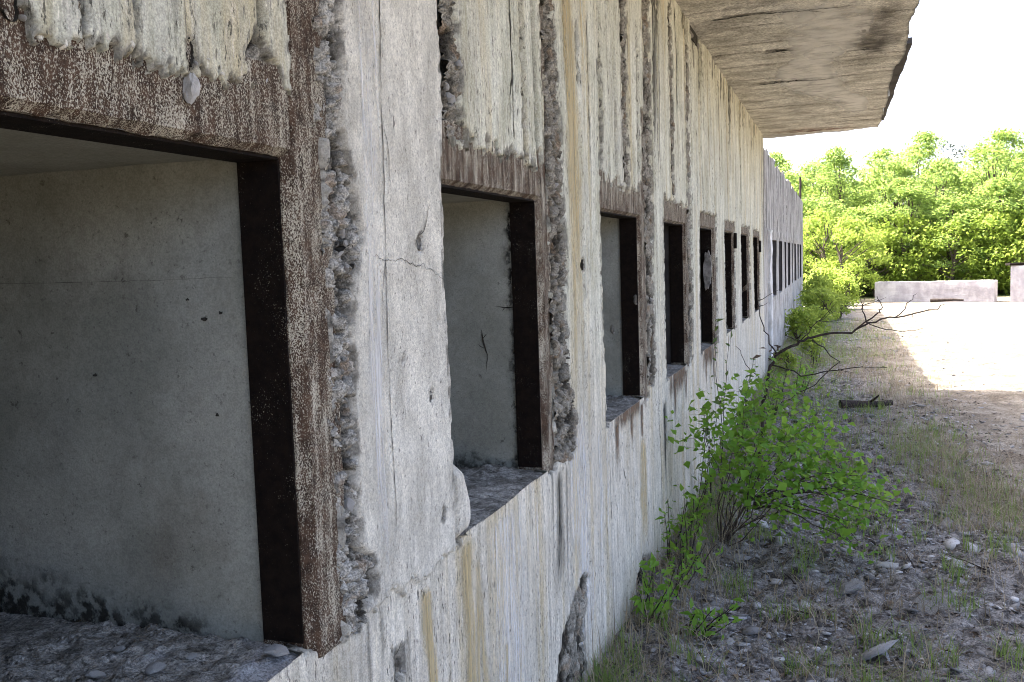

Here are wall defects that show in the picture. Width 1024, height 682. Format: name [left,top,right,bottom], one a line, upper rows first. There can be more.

spalling [245,38,264,62]
crack [376,0,384,79]
spalling [437,0,465,144]
crack [374,107,443,372]
spalling [540,0,579,463]
spalling [619,0,657,386]
spalling [312,0,378,635]
leakage [557,445,594,599]
leakage [0,578,201,634]
leakage [423,594,438,682]
spalling [557,574,588,682]